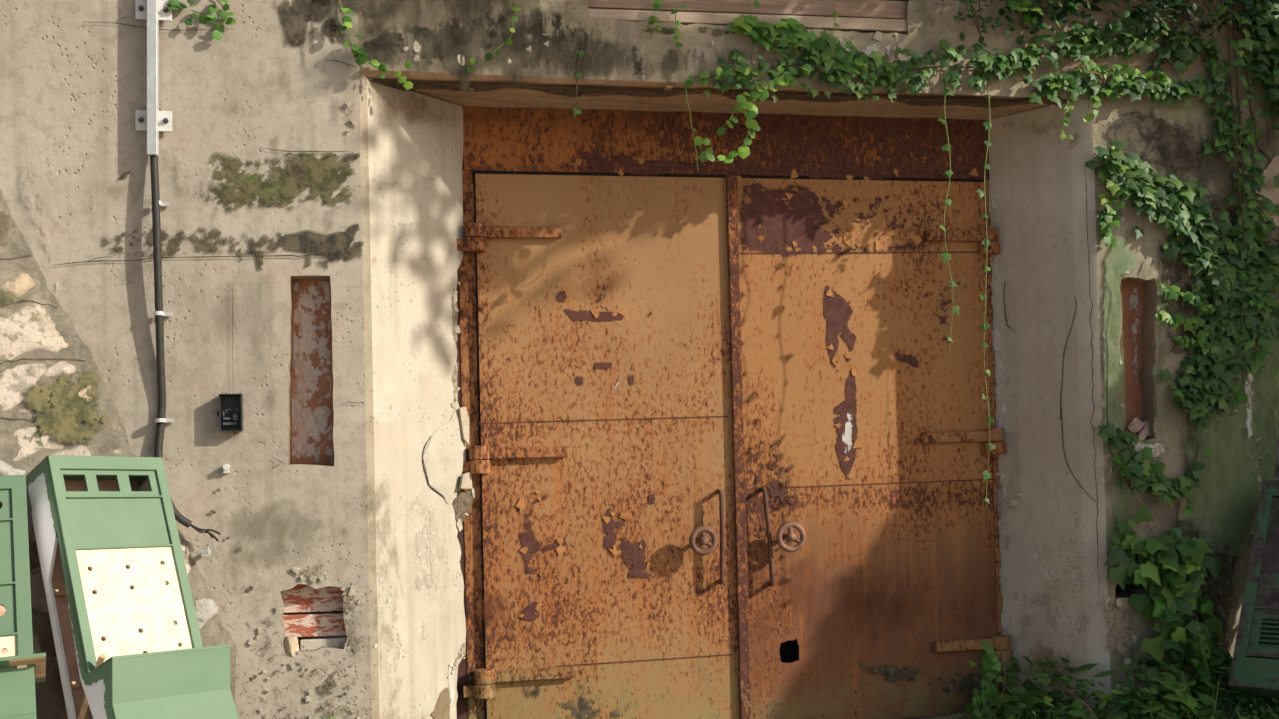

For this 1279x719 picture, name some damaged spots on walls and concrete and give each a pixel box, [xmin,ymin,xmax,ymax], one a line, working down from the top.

water stain [278,0,641,99]
water stain [662,50,678,82]
water stain [323,153,360,162]
water stain [103,224,364,272]
peeling [292,281,333,464]
crack [1060,173,1155,593]
peeling [1119,271,1140,384]
spalling [1127,417,1165,457]
water stain [1227,340,1260,438]
corrosion [746,440,804,551]
spalling [244,585,378,719]